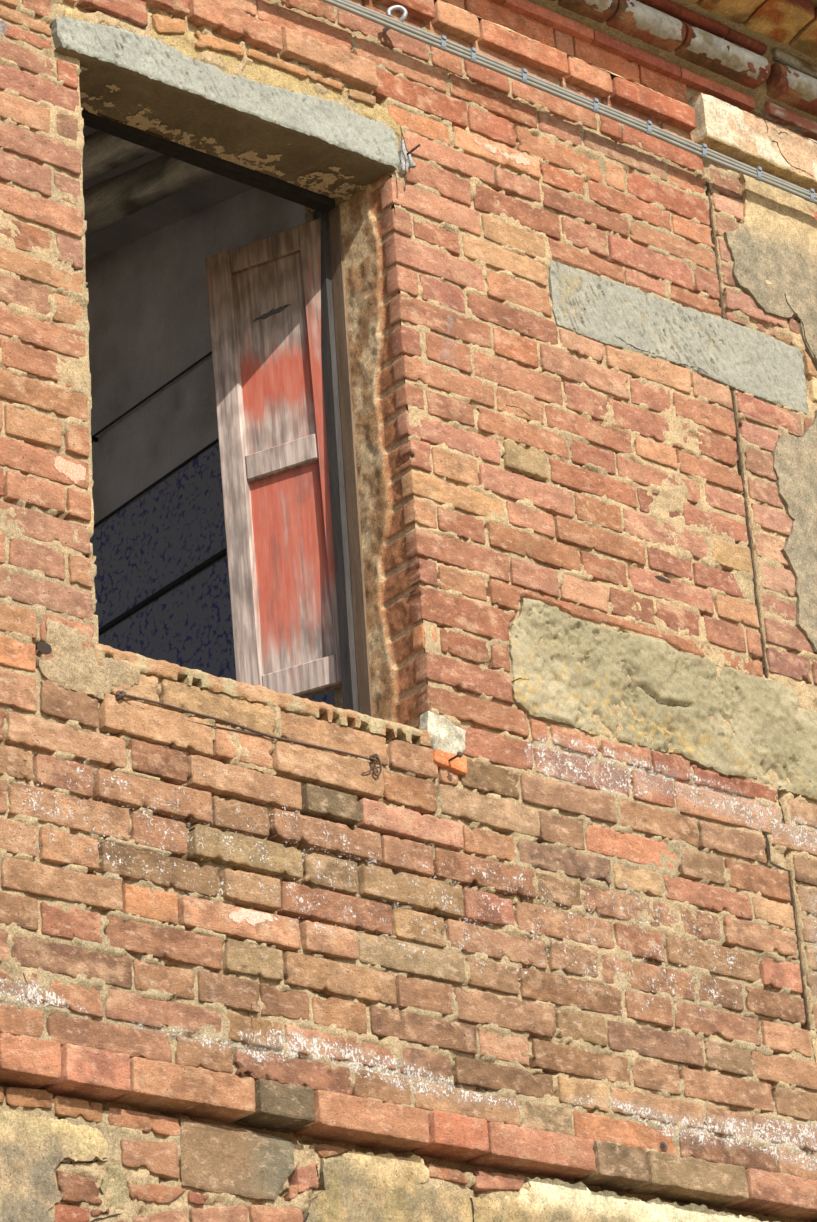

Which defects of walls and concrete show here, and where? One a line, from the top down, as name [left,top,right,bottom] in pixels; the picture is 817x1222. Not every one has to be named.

crack [705,181,726,319]
peeling [723,160,817,371]
crack [615,336,707,373]
crack [730,390,769,678]
peeling [771,410,817,653]
crack [765,796,817,1033]
peeling [0,1110,108,1222]
leakage [132,1022,520,1107]
leakage [571,1095,817,1170]